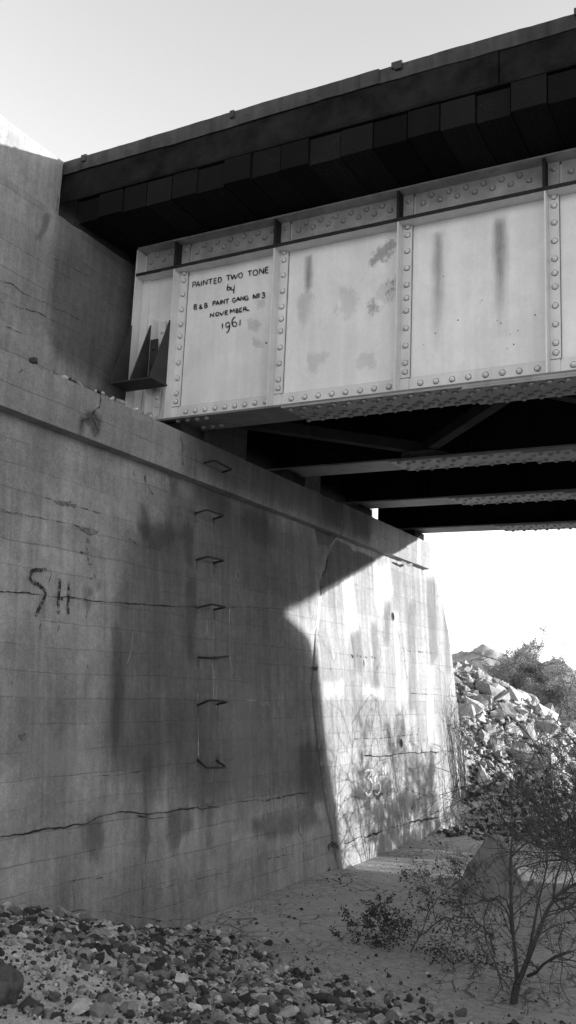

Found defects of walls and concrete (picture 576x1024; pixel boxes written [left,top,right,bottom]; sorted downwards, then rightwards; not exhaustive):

crack [0,591,197,608]
crack [1,702,438,922]